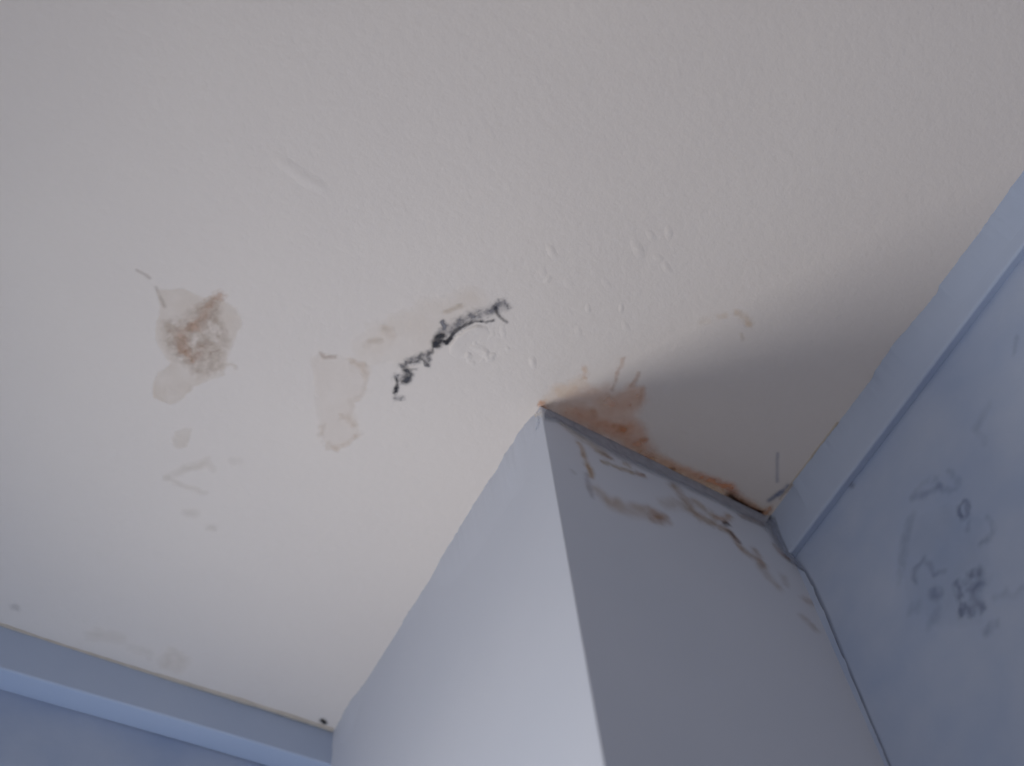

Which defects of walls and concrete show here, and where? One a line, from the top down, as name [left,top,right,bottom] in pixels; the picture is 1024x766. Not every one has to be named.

crack [394,302,508,394]